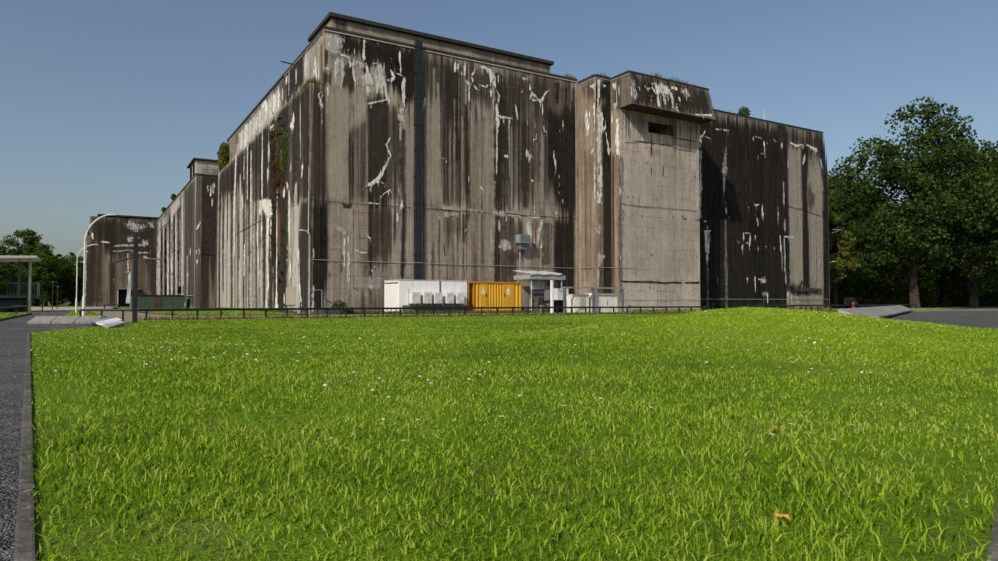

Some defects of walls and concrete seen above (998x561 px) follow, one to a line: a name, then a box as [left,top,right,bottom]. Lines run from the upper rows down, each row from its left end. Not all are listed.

water stain [85,34,830,314]
peeling [436,83,558,251]